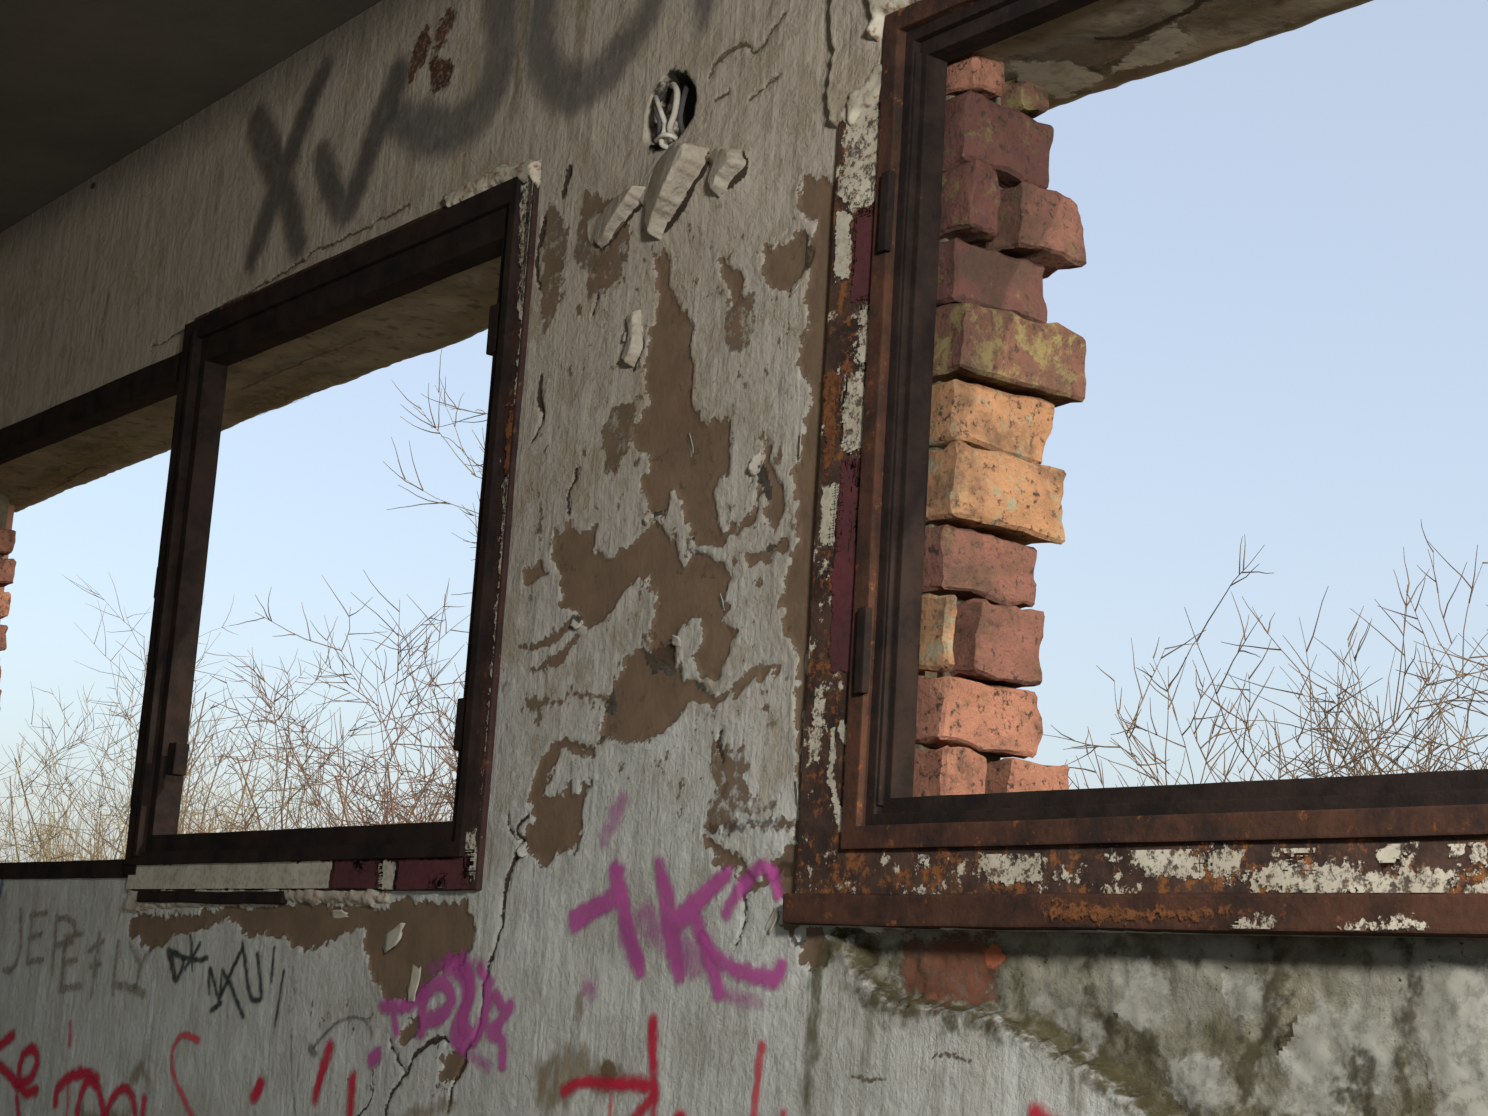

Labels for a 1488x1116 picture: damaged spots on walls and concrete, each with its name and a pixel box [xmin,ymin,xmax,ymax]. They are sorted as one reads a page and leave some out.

leakage [1030,0,1260,71]
flaking render [443,0,1488,1116]
flaking render [123,828,477,1105]
leakage [805,927,1170,1116]